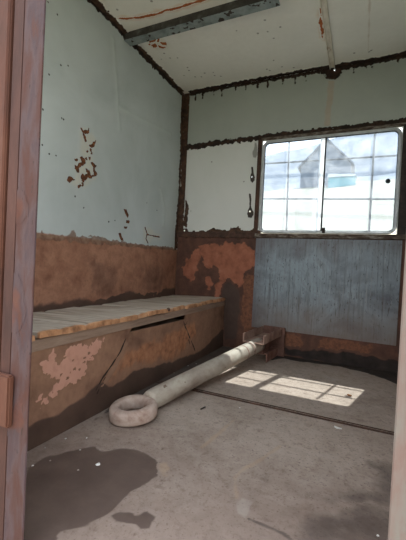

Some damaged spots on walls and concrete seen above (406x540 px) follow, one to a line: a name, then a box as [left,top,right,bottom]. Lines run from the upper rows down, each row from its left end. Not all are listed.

corrosion [85,0,129,40]
corrosion [131,44,406,251]
corrosion [239,272,256,336]
peeling [7,336,106,441]
crack [96,337,129,394]
corrosion [315,335,377,354]
water stain [24,444,162,540]